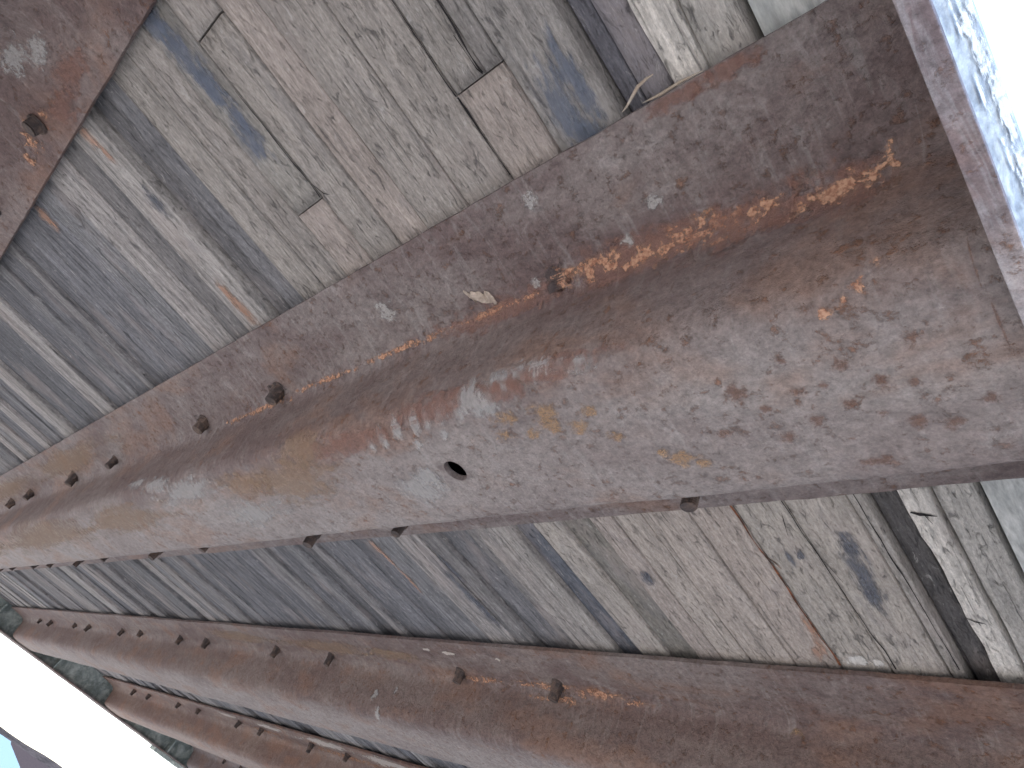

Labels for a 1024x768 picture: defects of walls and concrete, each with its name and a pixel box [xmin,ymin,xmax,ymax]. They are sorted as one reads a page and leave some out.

corrosion [789,138,901,219]
corrosion [550,194,781,288]
corrosion [818,275,865,320]
corrosion [226,293,539,424]
corrosion [466,676,644,707]